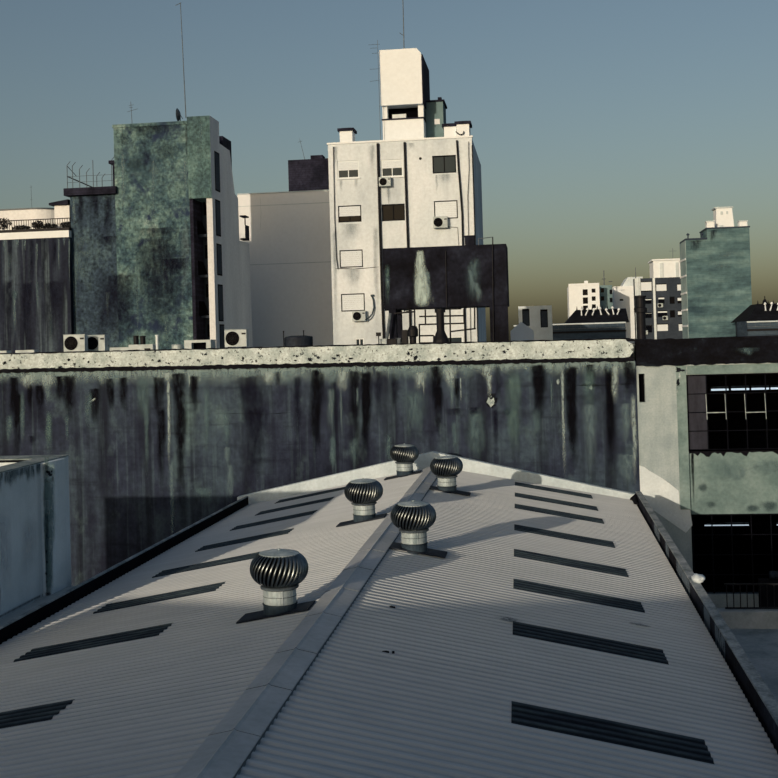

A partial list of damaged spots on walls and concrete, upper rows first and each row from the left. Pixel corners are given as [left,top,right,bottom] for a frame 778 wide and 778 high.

damp [144,228,183,300]
damp [0,361,636,481]
damp [0,457,54,617]